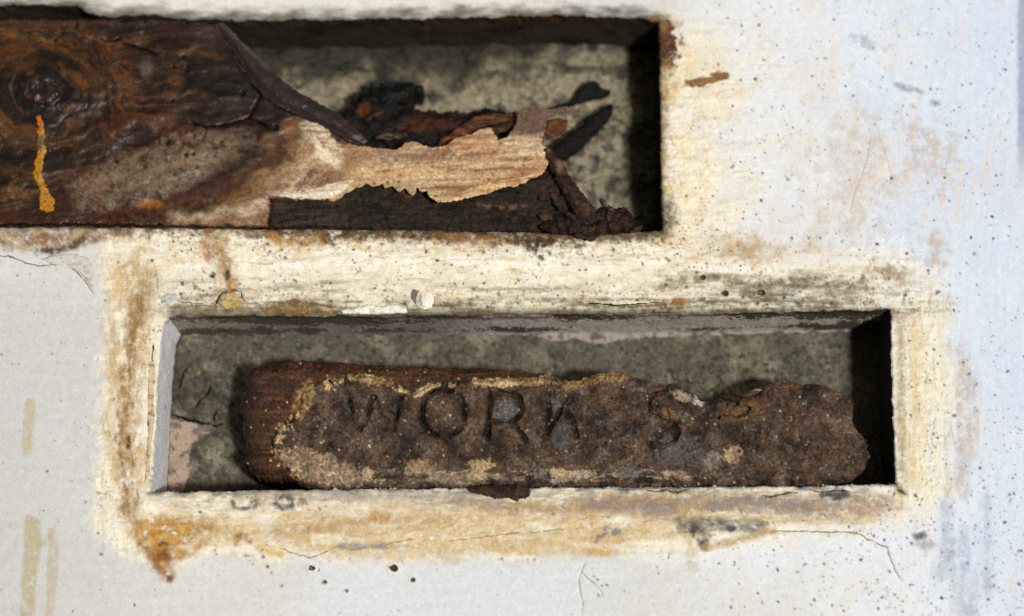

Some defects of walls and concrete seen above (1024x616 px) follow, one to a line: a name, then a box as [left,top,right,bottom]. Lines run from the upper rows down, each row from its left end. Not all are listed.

corrosion [685,71,729,87]
crack [0,255,94,295]
water stain [821,491,850,500]
corrosion [133,516,217,581]
water stain [194,490,774,563]
crack [773,530,901,580]